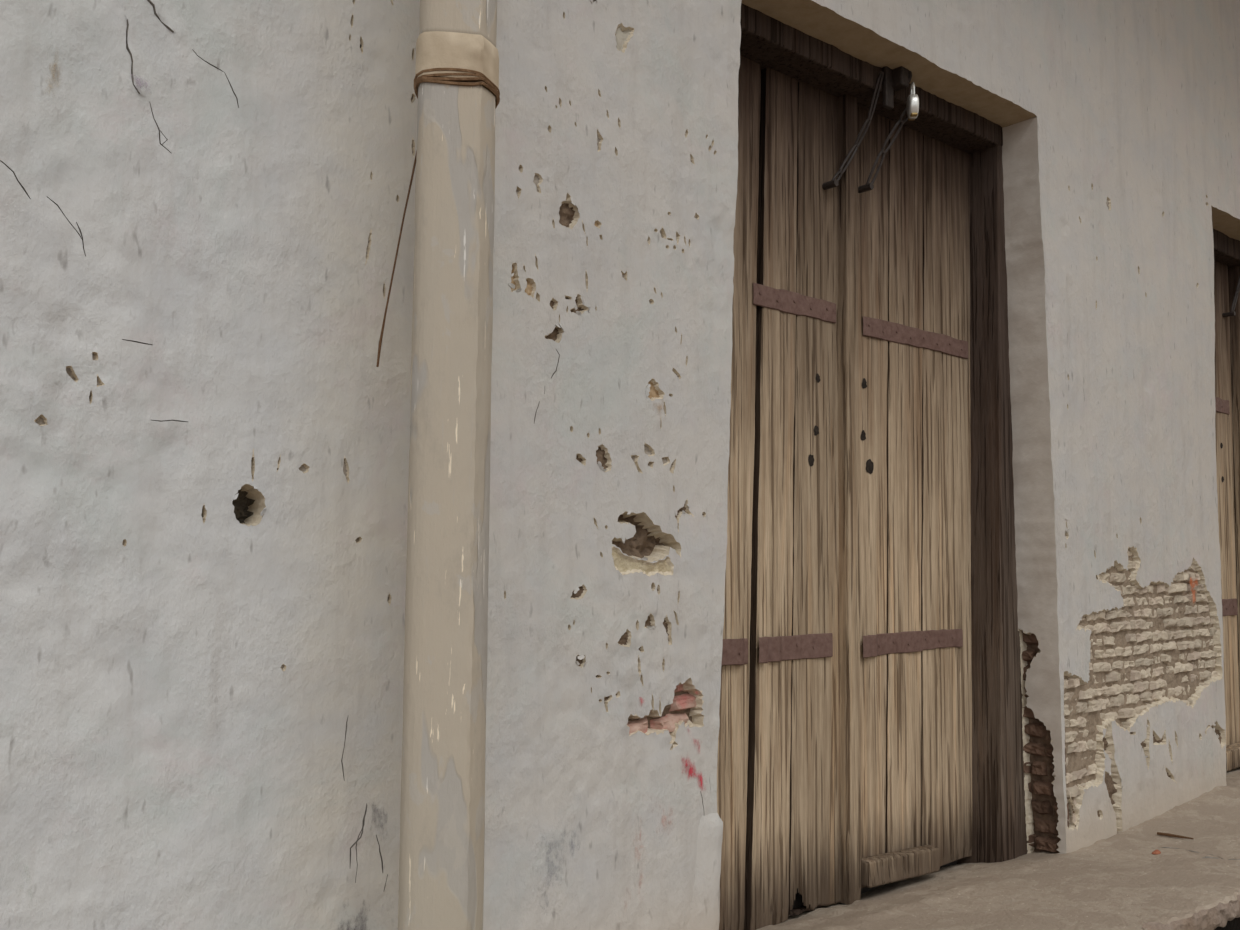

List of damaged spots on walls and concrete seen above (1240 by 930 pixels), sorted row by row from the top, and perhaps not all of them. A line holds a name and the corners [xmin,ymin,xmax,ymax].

crack [126,0,239,154]
crack [0,160,86,256]
spalling [594,443,706,594]
spalling [576,655,620,712]
flaking render [606,592,704,750]
flaking render [1018,534,1226,854]